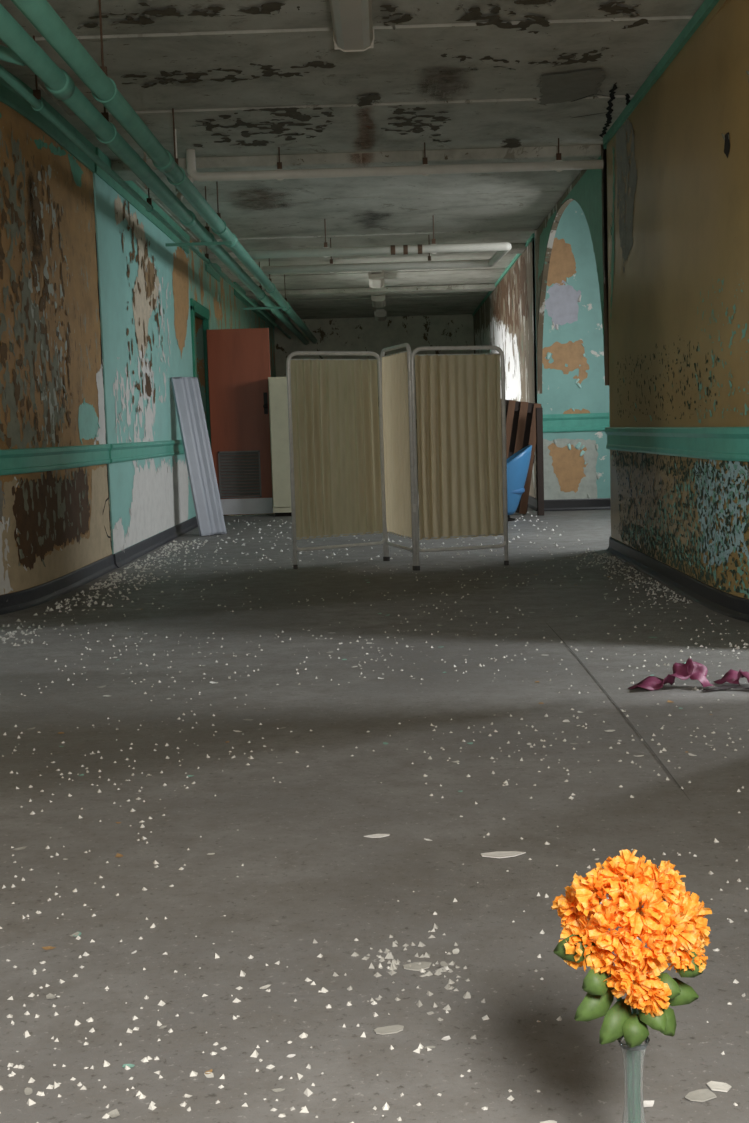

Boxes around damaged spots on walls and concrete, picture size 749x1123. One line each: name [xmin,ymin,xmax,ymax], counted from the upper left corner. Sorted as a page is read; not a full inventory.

flaking render [722,132,730,158]
peeling [0,132,189,449]
peeling [475,138,615,401]
peeling [616,273,749,423]
peeling [0,456,189,595]
peeling [543,438,599,500]